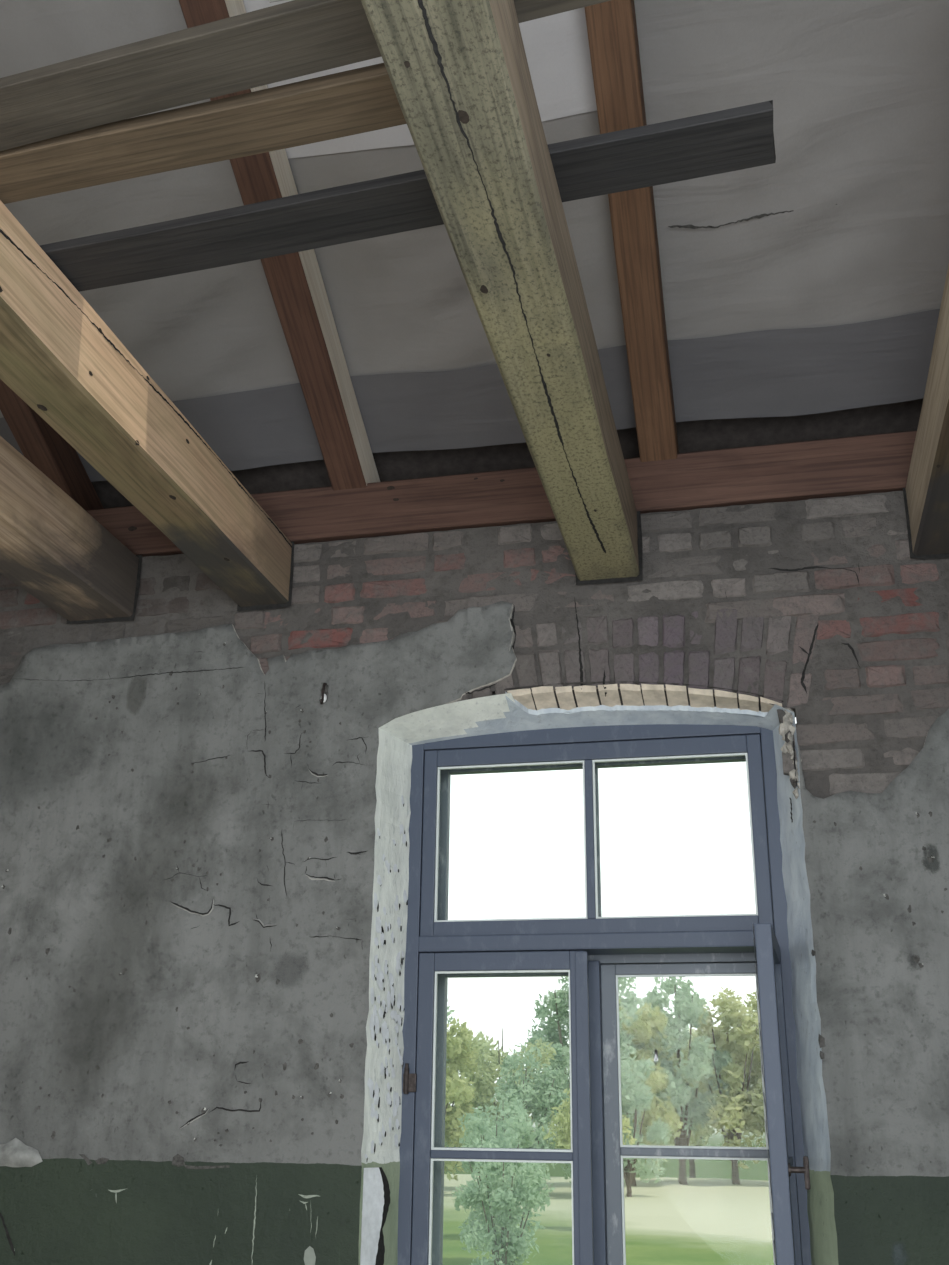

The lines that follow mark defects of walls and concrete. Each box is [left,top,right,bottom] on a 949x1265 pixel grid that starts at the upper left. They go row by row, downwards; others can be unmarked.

crack [418,0,606,553]
crack [27,651,367,951]
flaking render [0,528,471,686]
flaking render [505,491,949,822]
crack [182,1061,262,1128]